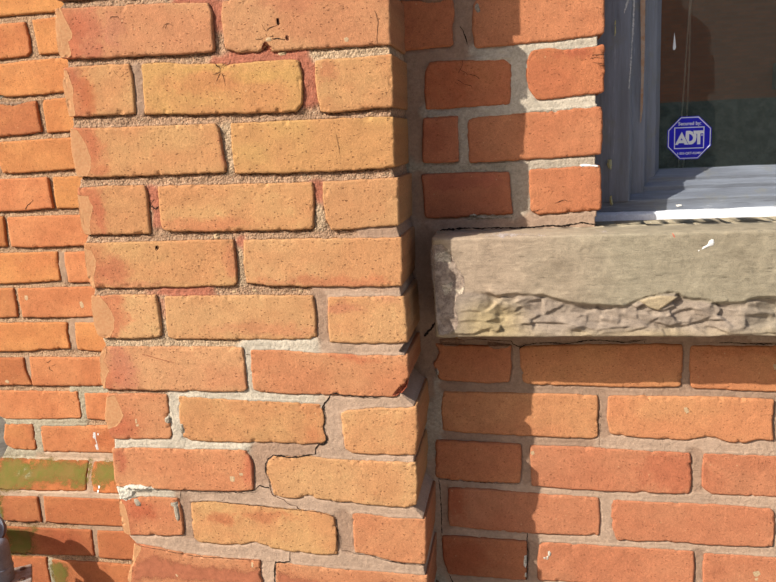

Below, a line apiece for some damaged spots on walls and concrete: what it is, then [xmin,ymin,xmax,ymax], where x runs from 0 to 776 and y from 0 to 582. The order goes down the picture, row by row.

crack [440,210,597,231]
spalling [430,244,465,336]
crack [463,339,645,350]
crack [180,393,425,565]